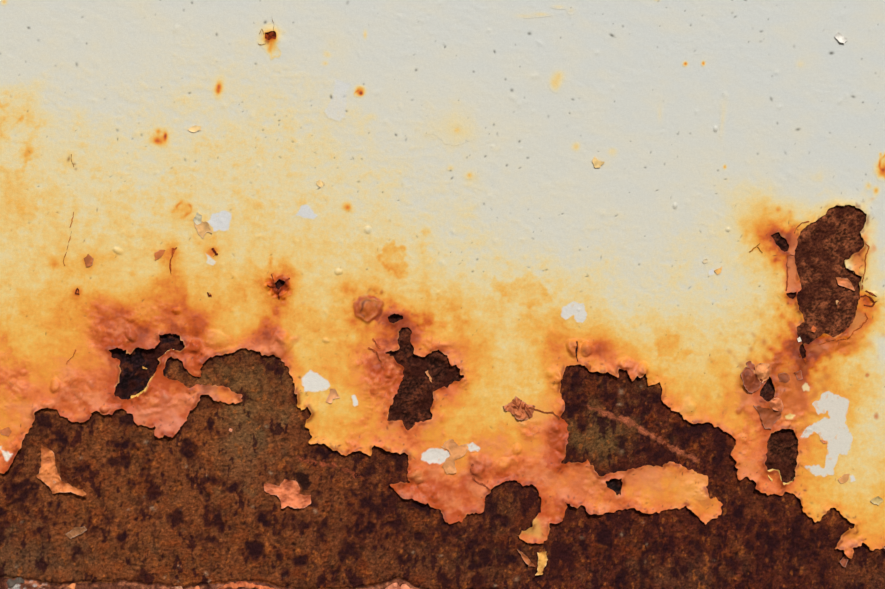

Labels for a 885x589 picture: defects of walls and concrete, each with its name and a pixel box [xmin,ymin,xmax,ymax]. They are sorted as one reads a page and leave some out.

corrosion [0,160,48,239]
corrosion [17,121,45,177]
corrosion [147,127,170,150]
corrosion [170,195,197,221]
corrosion [724,186,813,278]
corrosion [867,151,885,198]
corrosion [246,259,303,329]
corrosion [342,280,412,348]
corrosion [485,267,557,313]
corrosion [856,270,885,326]
corrosion [772,325,839,387]
peeling [0,321,885,589]